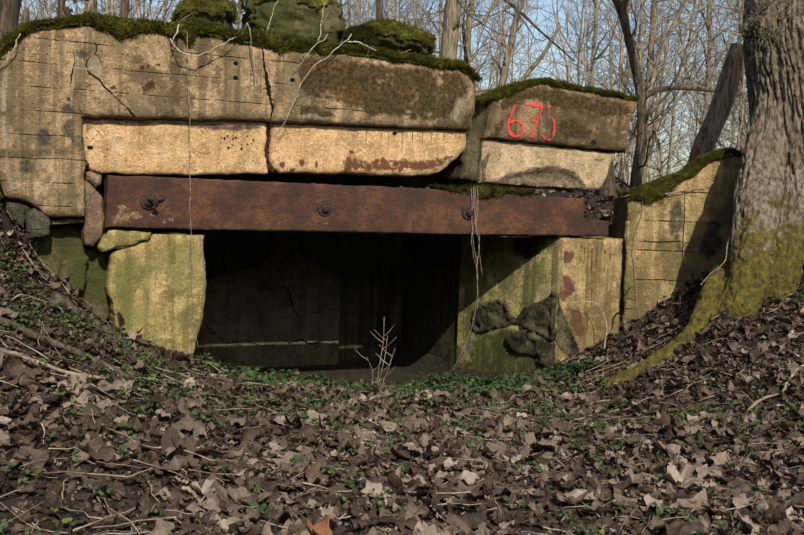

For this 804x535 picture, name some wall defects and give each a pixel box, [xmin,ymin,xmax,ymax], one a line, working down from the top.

crack [70,40,135,117]
crack [262,49,275,172]
corrosion [343,150,453,172]
crack [204,269,338,369]